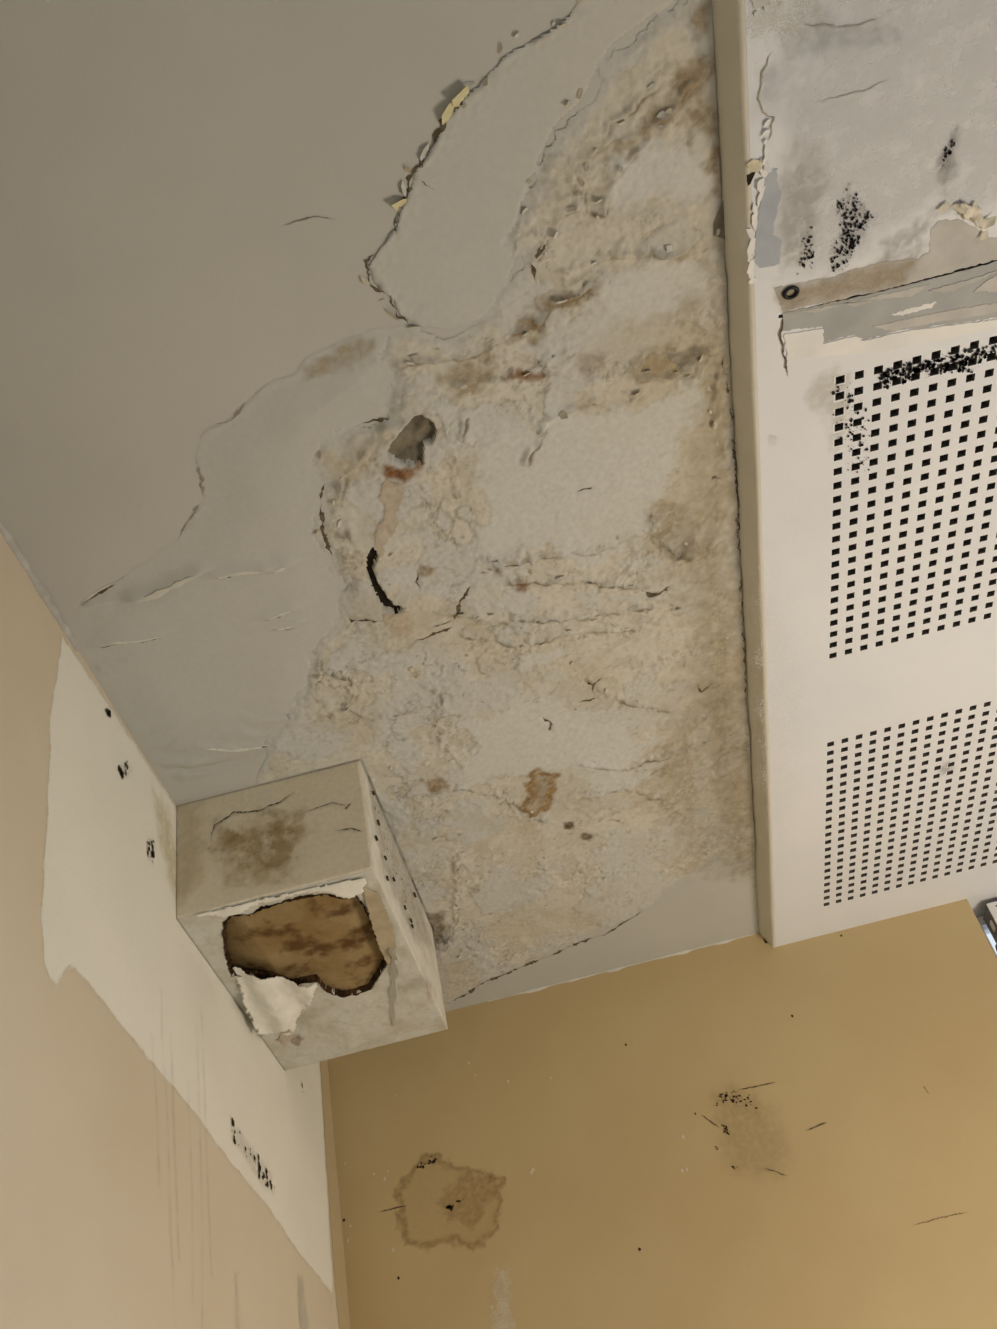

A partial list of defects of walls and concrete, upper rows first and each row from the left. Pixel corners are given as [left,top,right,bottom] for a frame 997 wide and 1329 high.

crack [364,87,475,322]
peeling [746,119,772,284]
mould [797,227,815,275]
mould [830,184,874,273]
mould [877,345,997,390]
leakage [832,385,870,473]
crack [319,483,332,554]
flaking render [207,0,756,1008]
crack [345,548,470,641]
crack [211,791,362,835]
leakage [372,791,444,941]
spalling [196,878,400,1026]